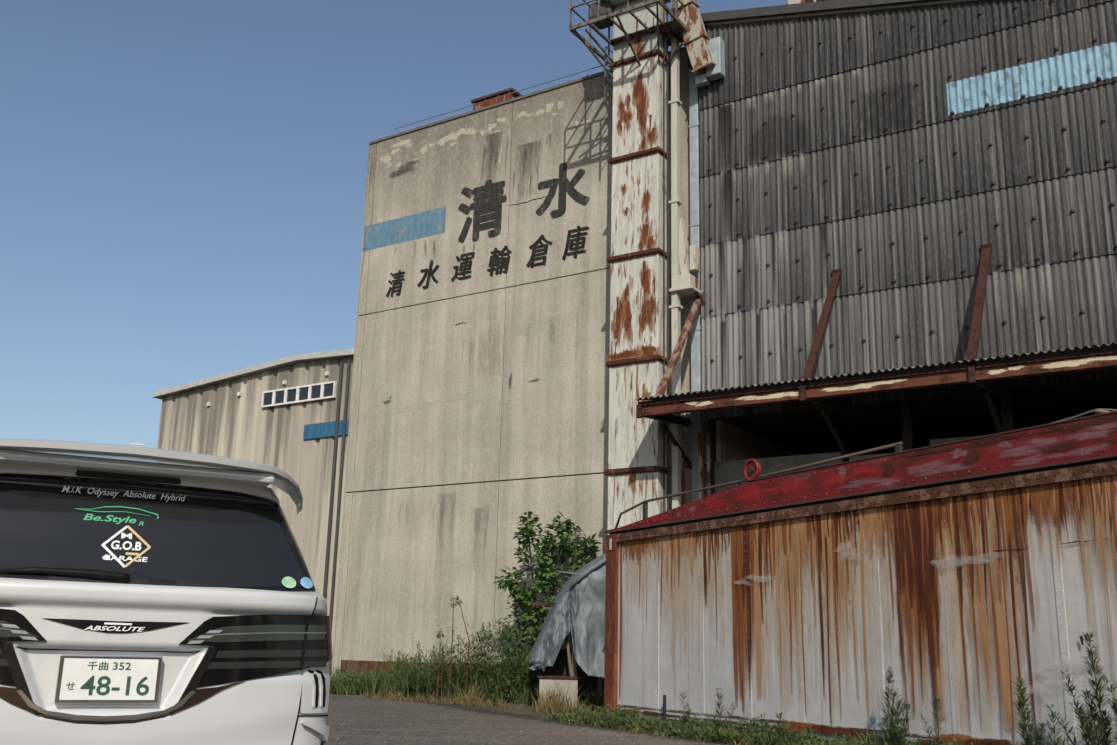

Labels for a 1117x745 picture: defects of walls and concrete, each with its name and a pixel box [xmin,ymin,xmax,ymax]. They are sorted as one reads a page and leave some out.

corrosion [633,17,654,55]
corrosion [617,72,657,151]
peeling [379,101,565,168]
corrosion [608,189,661,401]
peeling [735,392,799,400]
peeling [823,379,905,392]
peeling [989,365,1025,375]
peeling [1042,356,1117,368]
corrosion [613,473,654,502]
corrosion [619,475,1117,745]